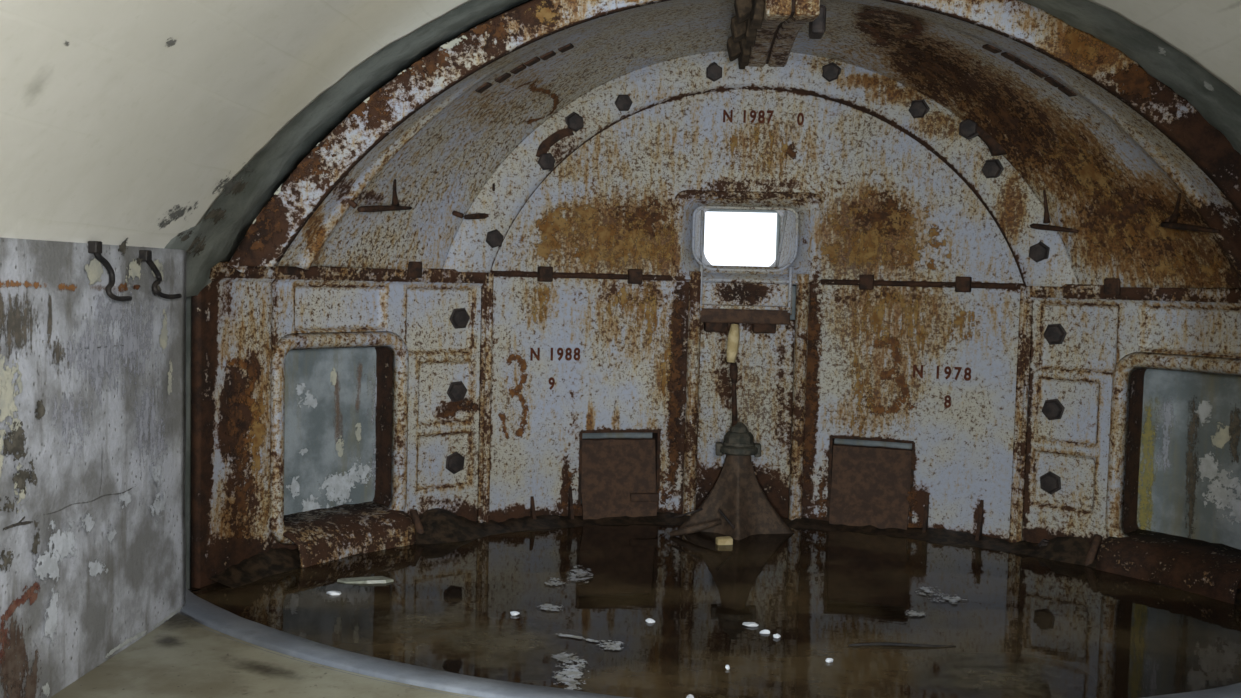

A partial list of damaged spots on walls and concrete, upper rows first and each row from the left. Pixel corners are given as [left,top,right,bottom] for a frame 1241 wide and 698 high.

rust [346,88,394,127]
rust [400,48,451,80]
rust [460,19,518,49]
rust [530,1,560,25]
rust [820,186,960,272]
damp [0,290,168,473]
rust [225,357,267,540]
rust [520,196,684,516]
rust [803,290,829,519]
rust [845,286,977,438]
peeling [0,354,117,698]
damp [160,613,193,643]